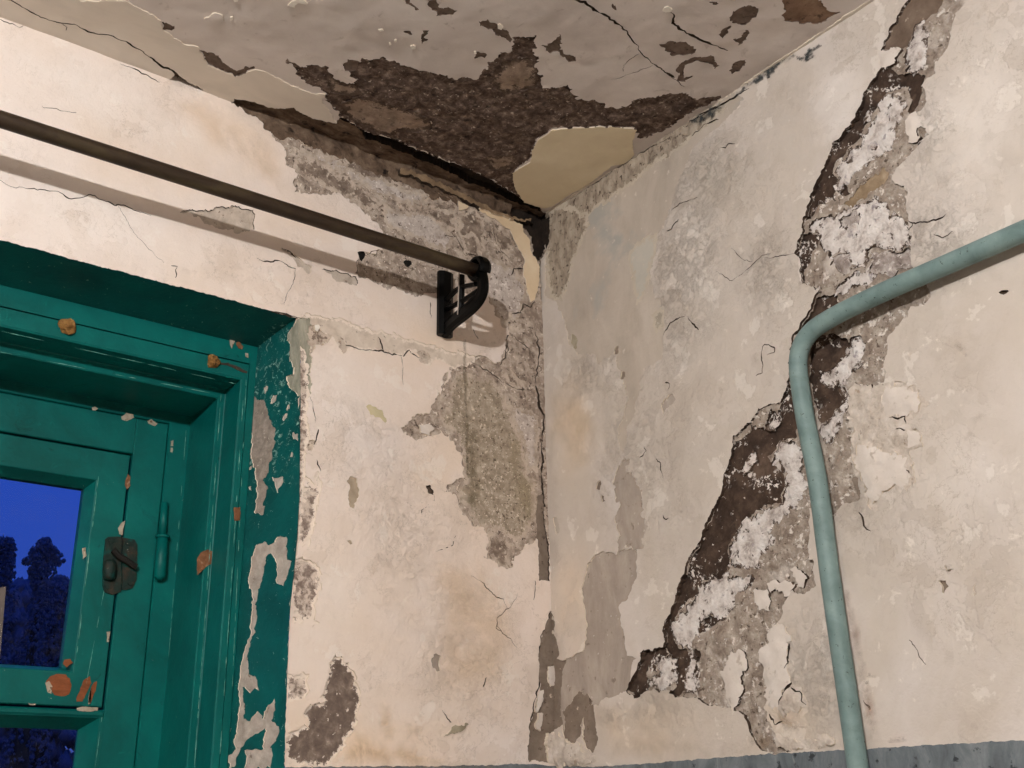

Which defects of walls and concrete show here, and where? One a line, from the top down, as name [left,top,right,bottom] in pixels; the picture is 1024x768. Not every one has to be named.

crack [663,6,694,35]
crack [378,134,550,409]
peeling [117,0,869,768]
crack [536,494,549,581]
spalling [808,284,931,518]
spalling [793,0,967,341]